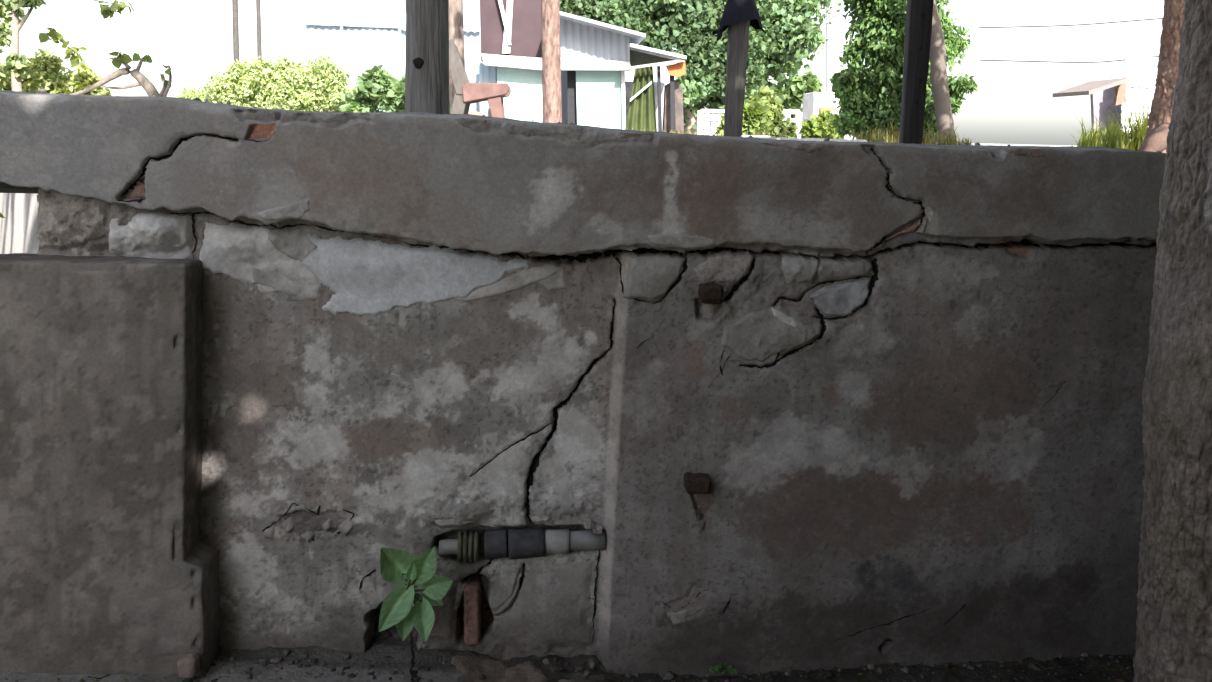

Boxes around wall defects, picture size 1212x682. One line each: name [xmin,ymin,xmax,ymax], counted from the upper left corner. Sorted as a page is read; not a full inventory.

crack [118,132,275,203]
rust [245,116,459,248]
peeling [36,177,566,316]
peeling [625,234,753,300]
peeling [778,206,934,316]
crack [712,148,1157,382]
crack [170,211,781,523]
peeling [697,299,820,362]
spalling [264,504,355,544]